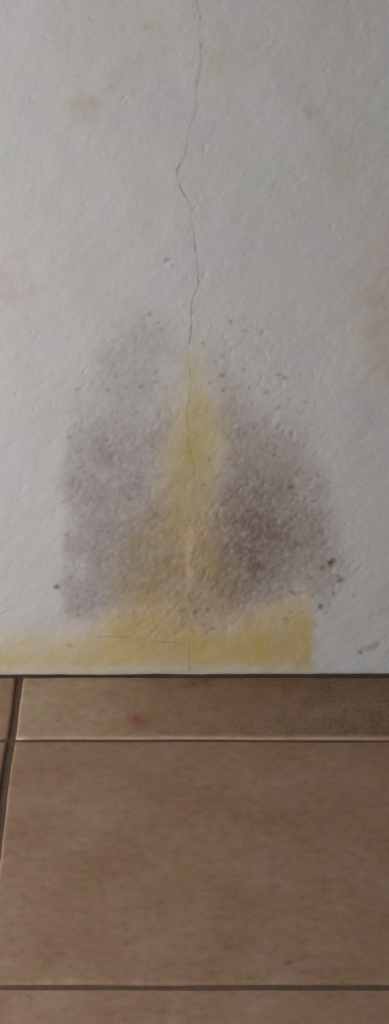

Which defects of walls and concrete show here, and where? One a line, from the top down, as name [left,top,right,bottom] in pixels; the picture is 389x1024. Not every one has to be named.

water stain [55,351,344,668]